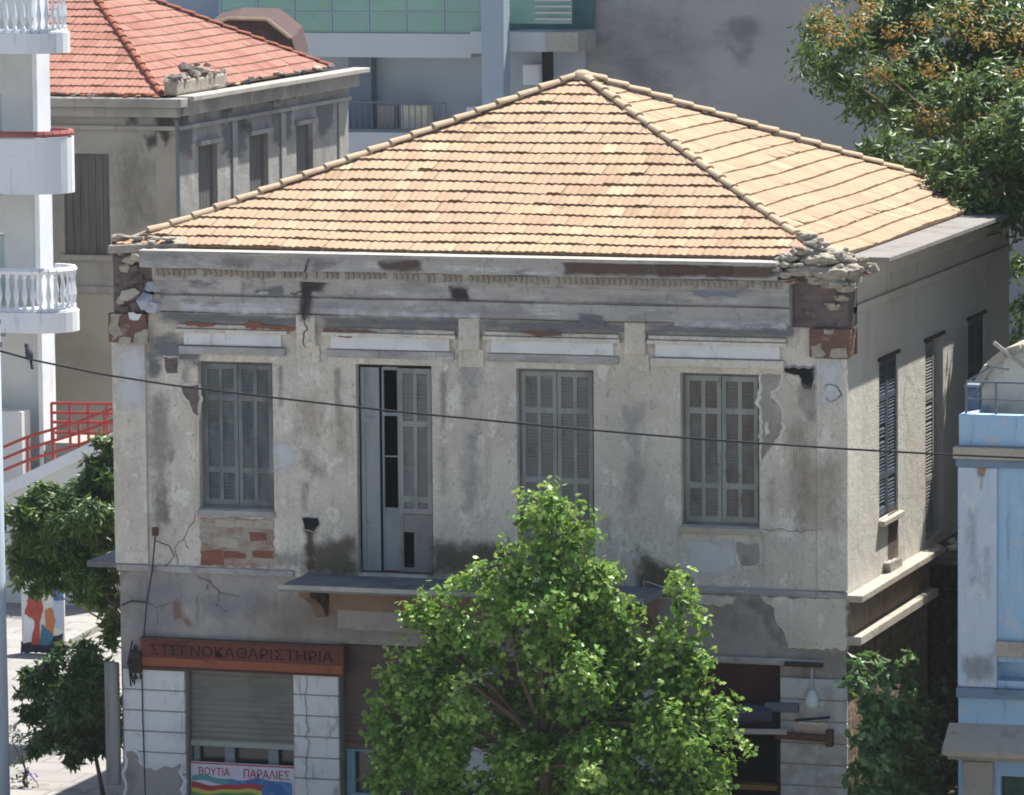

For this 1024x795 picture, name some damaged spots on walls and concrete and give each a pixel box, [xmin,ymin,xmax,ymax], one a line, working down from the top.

spalling [107,228,189,345]
peeling [163,355,204,419]
peeling [754,328,857,462]
crack [175,511,239,611]
flaking render [199,517,275,568]
leakage [303,538,356,575]
leakage [432,543,516,574]
peeling [734,538,763,572]
peeling [759,596,849,653]
peeling [121,748,187,795]